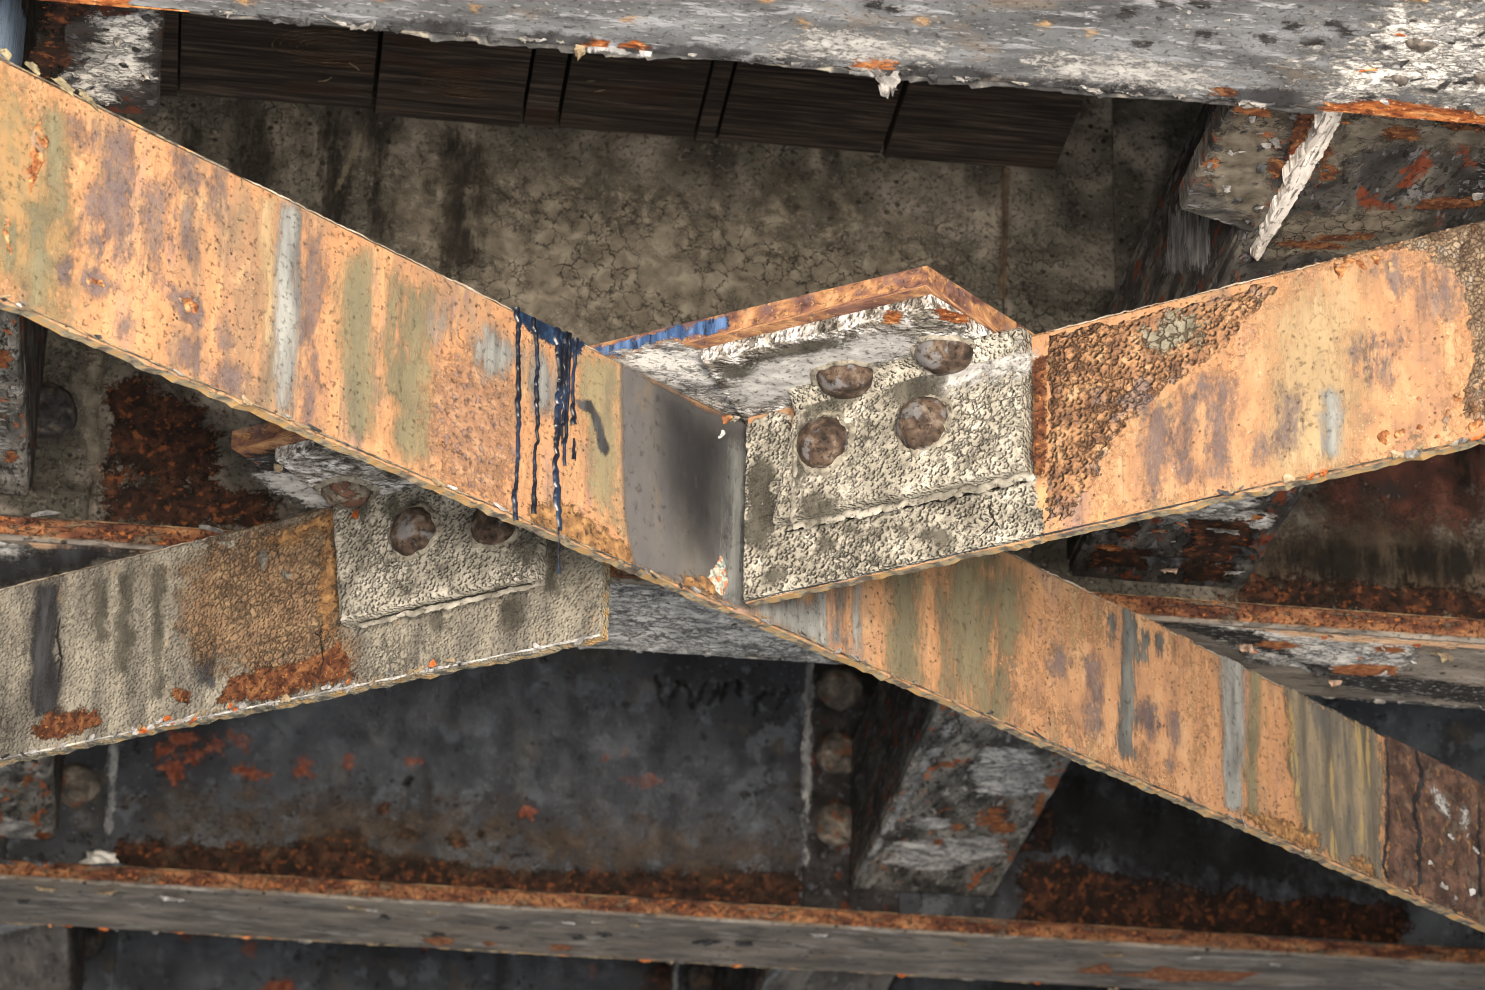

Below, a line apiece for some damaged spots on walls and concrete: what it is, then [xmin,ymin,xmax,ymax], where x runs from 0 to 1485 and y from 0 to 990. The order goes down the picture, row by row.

rust [26,119,49,195]
peeling [0,0,1485,259]
rust [58,115,358,707]
rust [417,342,635,563]
rust [1031,195,1485,619]
rust [29,704,103,741]
rust [154,727,274,789]
rust [995,586,1224,806]
rust [933,774,1415,943]
rust [1255,640,1302,650]
rust [1329,645,1405,677]
rust [1429,785,1469,829]